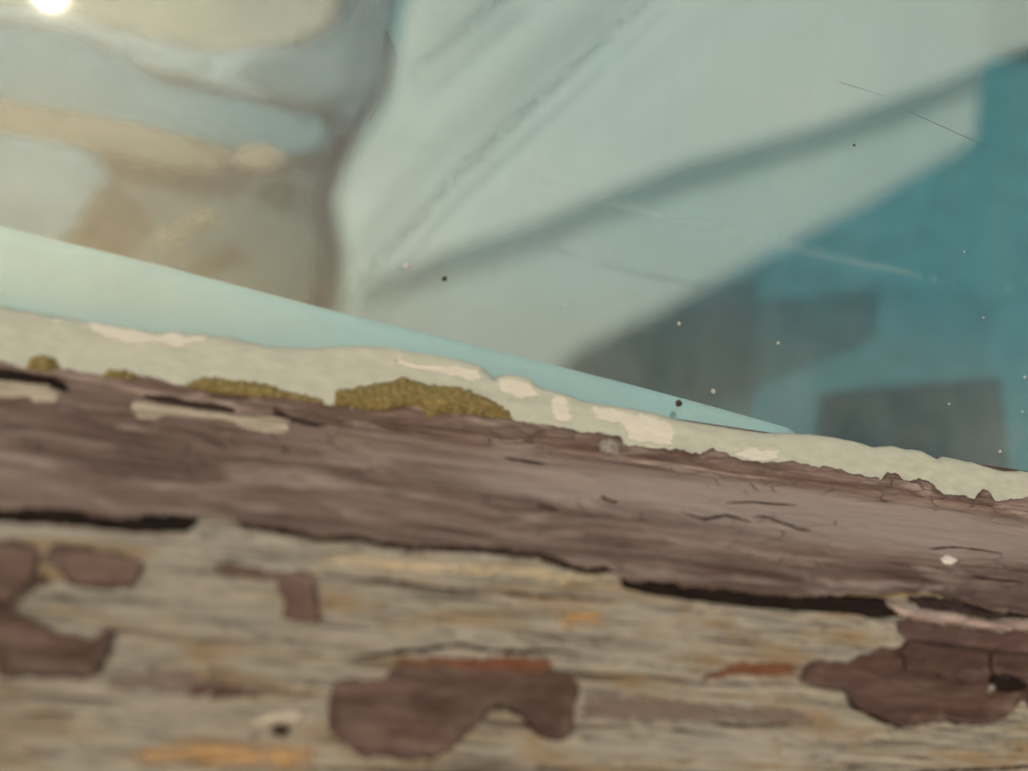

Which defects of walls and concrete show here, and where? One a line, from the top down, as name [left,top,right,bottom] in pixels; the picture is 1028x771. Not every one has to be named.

crack [0,507,198,533]
peeling [0,515,1028,771]
crack [238,523,1028,693]